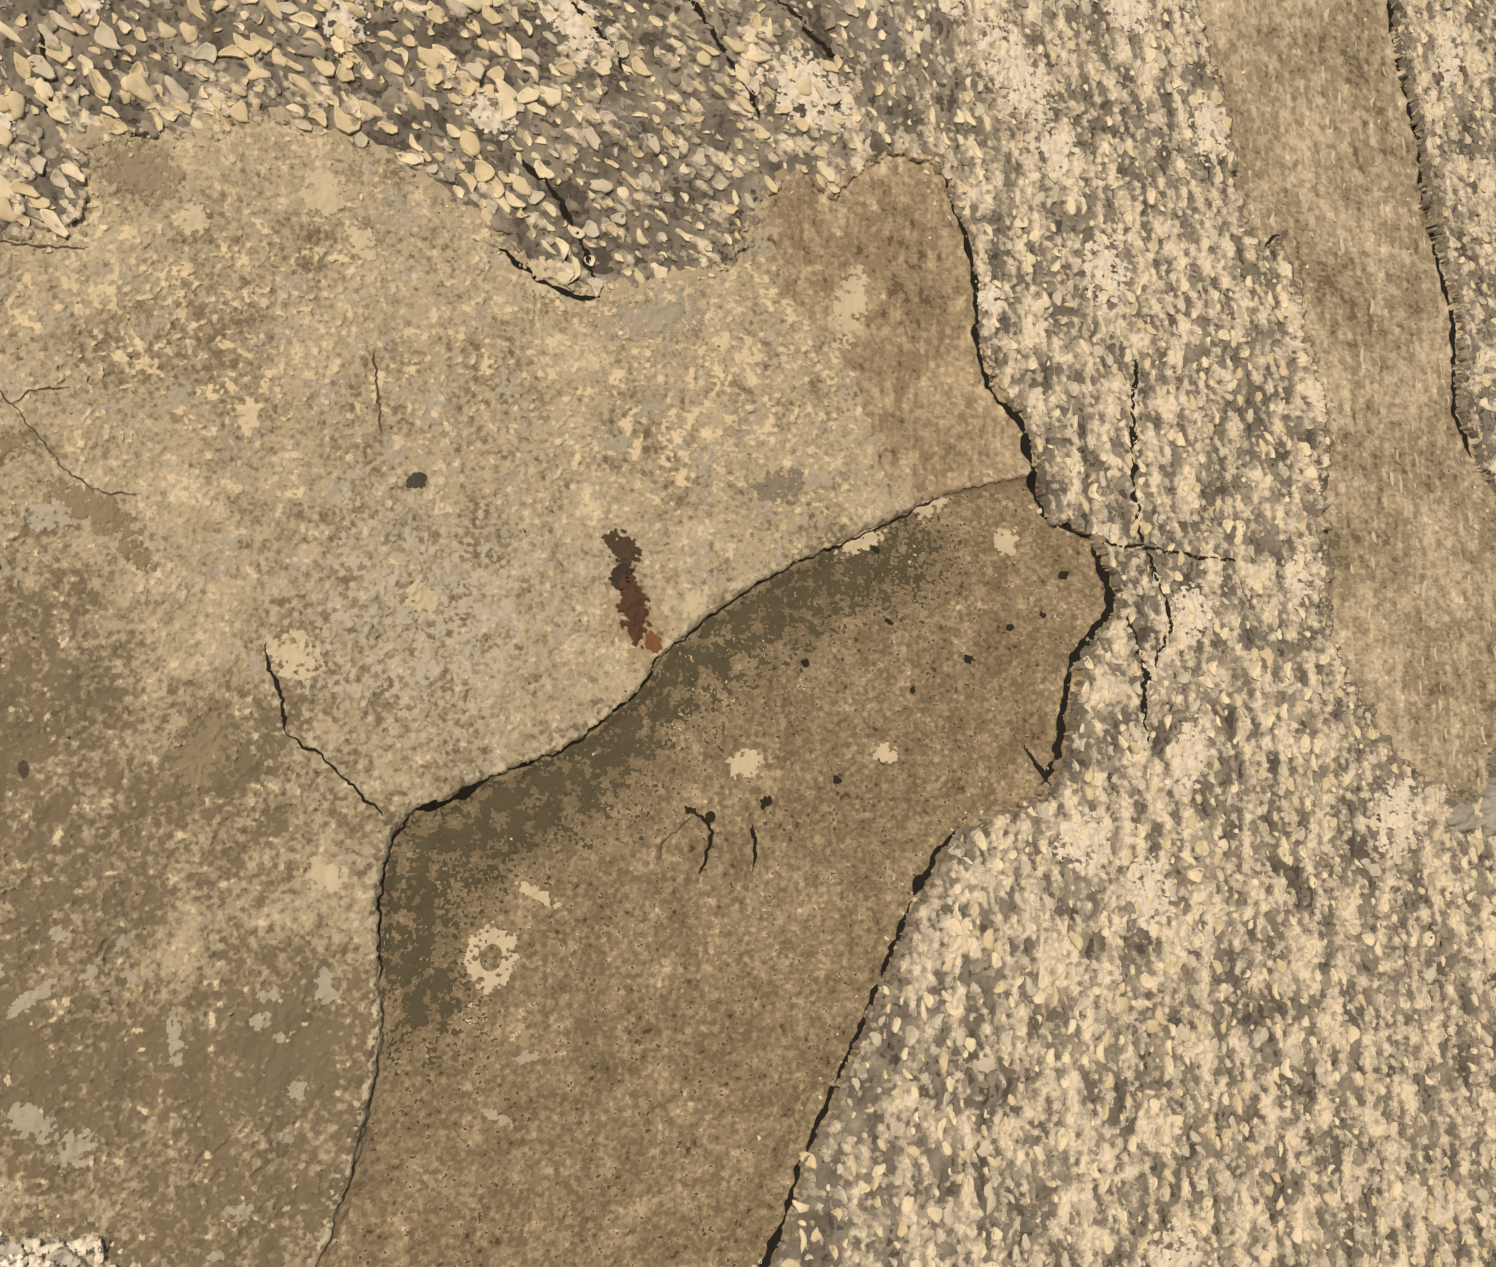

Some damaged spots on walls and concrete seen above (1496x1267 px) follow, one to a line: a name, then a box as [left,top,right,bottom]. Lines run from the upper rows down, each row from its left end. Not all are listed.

peeling [606,0,684,61]
peeling [655,209,668,243]
corrosion [601,571,669,673]
crack [264,498,938,1210]
peeling [1114,812,1238,899]
peeling [1276,886,1387,972]
peeling [1348,825,1496,1059]
crack [758,830,956,1267]
peeling [0,1090,217,1243]
peeling [824,1147,886,1222]
peeling [889,966,1176,1267]
peeling [1142,1163,1218,1267]